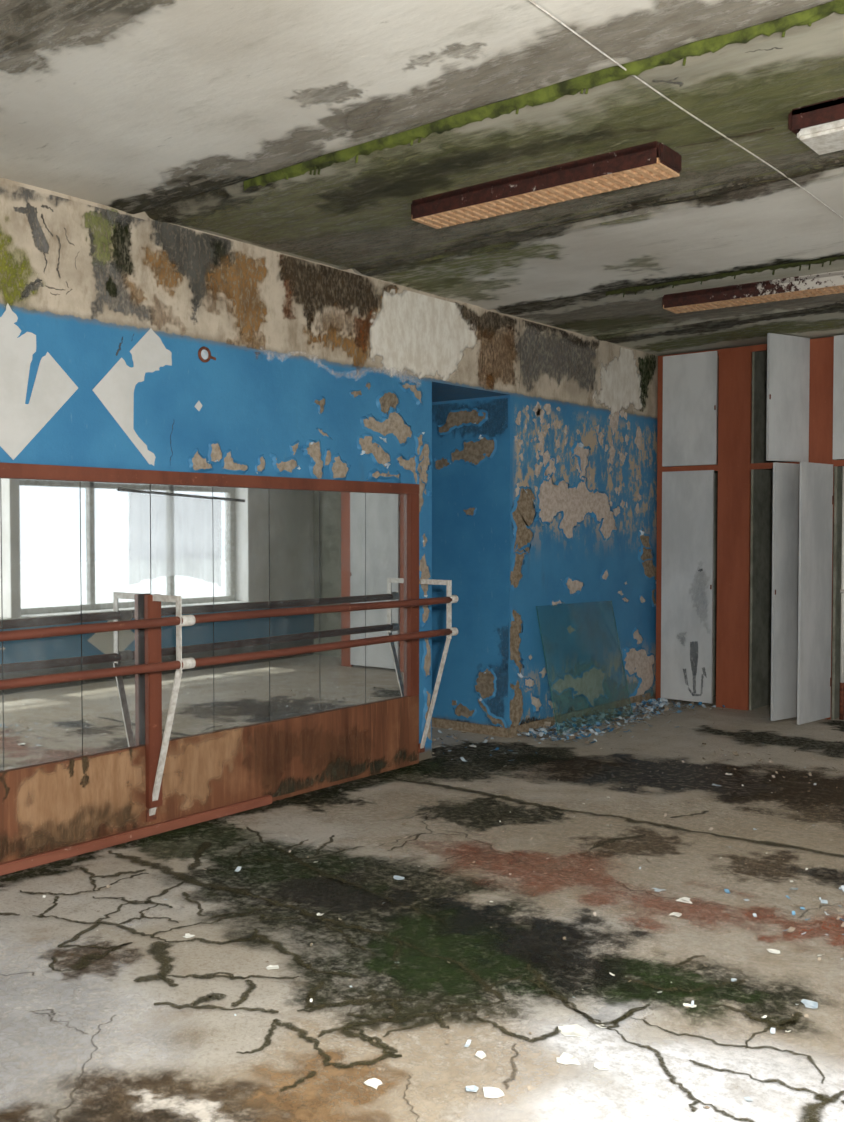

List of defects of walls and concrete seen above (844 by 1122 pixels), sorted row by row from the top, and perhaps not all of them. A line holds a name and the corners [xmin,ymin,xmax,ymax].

leakage [0,0,174,73]
peeling [14,203,49,254]
leakage [0,187,69,206]
leakage [84,0,844,416]
peeling [188,396,351,480]
peeling [349,380,497,515]
peeling [510,401,642,592]
peeling [419,531,432,743]
peeling [451,607,608,728]
leakage [515,754,844,824]
crack [0,779,844,1122]
leakage [64,898,844,1122]